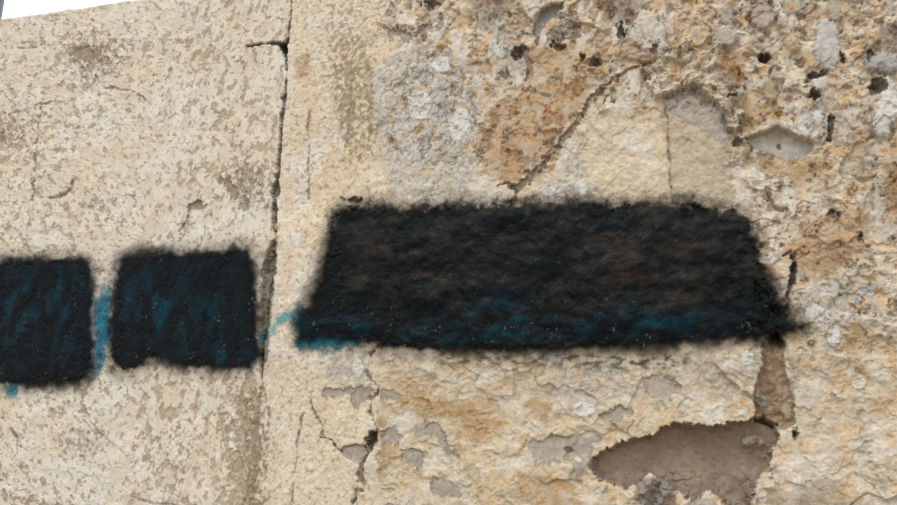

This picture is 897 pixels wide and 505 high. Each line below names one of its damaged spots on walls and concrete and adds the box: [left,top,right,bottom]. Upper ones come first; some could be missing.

crack [247,25,291,367]
crack [498,61,652,203]
crack [296,400,336,463]
crack [352,445,373,504]
spalling [527,340,795,505]